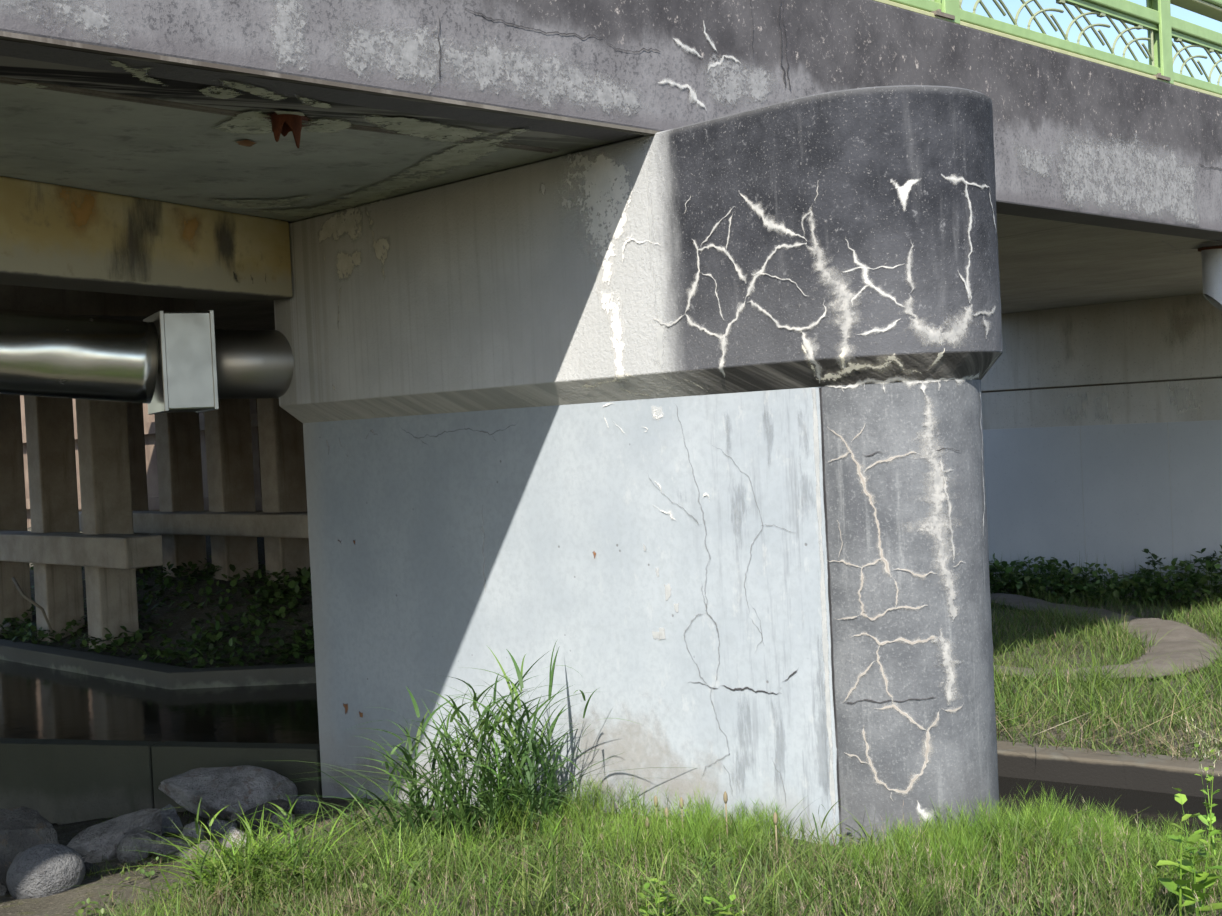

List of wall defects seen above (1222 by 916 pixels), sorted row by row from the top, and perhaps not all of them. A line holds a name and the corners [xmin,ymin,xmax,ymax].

spalling [110,61,164,86]
crack [435,16,443,79]
crack [468,9,661,52]
spalling [199,81,351,134]
crack [941,174,996,303]
peeling [561,152,658,396]
crack [653,194,905,383]
crack [829,386,985,799]
crack [692,671,797,694]